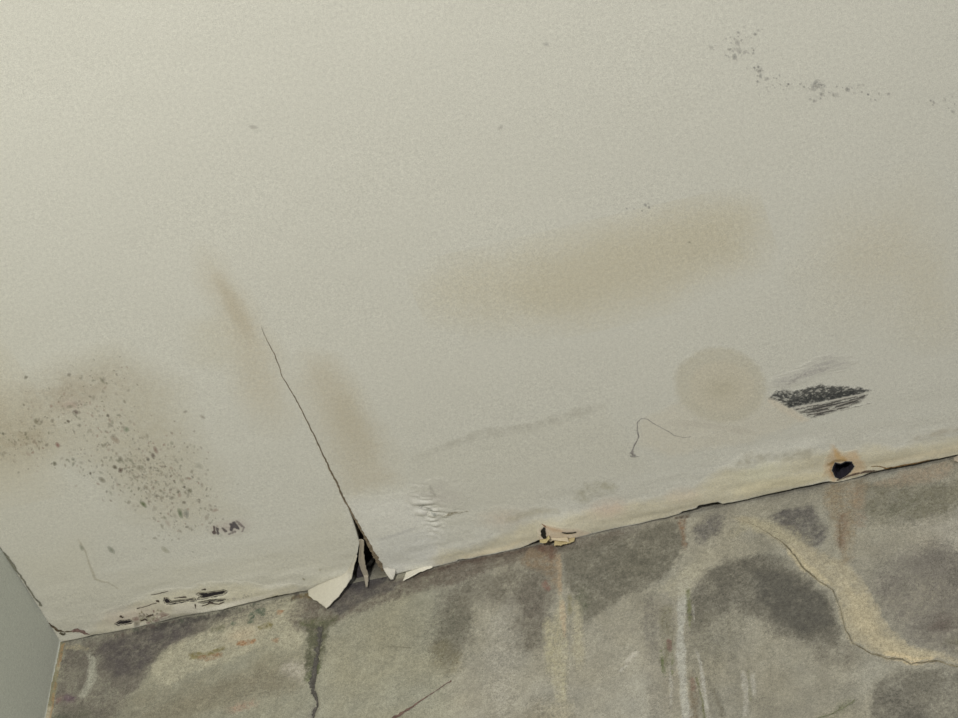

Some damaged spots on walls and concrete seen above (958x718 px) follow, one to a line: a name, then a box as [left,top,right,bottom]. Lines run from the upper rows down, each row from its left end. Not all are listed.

mould [708,26,890,102]
damp [406,187,780,341]
damp [0,238,610,553]
crack [262,330,384,587]
damp [634,345,874,459]
crack [0,548,90,635]
peeling [383,566,433,581]
damp [51,434,958,718]
crack [301,619,332,718]
crack [392,680,451,718]